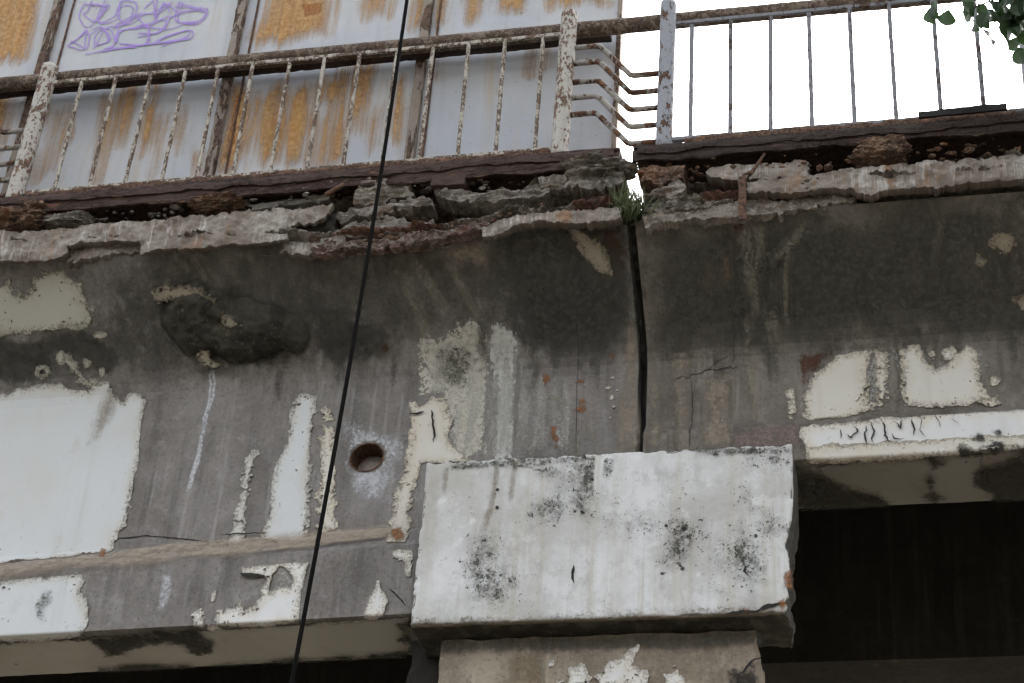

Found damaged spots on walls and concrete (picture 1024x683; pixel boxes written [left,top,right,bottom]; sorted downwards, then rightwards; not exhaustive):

spalling [147,134,1024,259]
peeling [0,270,107,341]
peeling [0,350,148,564]
peeling [260,393,339,542]
leakage [0,229,887,592]
peeling [386,318,517,577]
crack [674,309,735,444]
crack [840,414,958,443]
peeling [785,344,1024,505]
leakage [957,430,1024,502]
peeling [0,562,411,677]
mould [455,529,520,608]